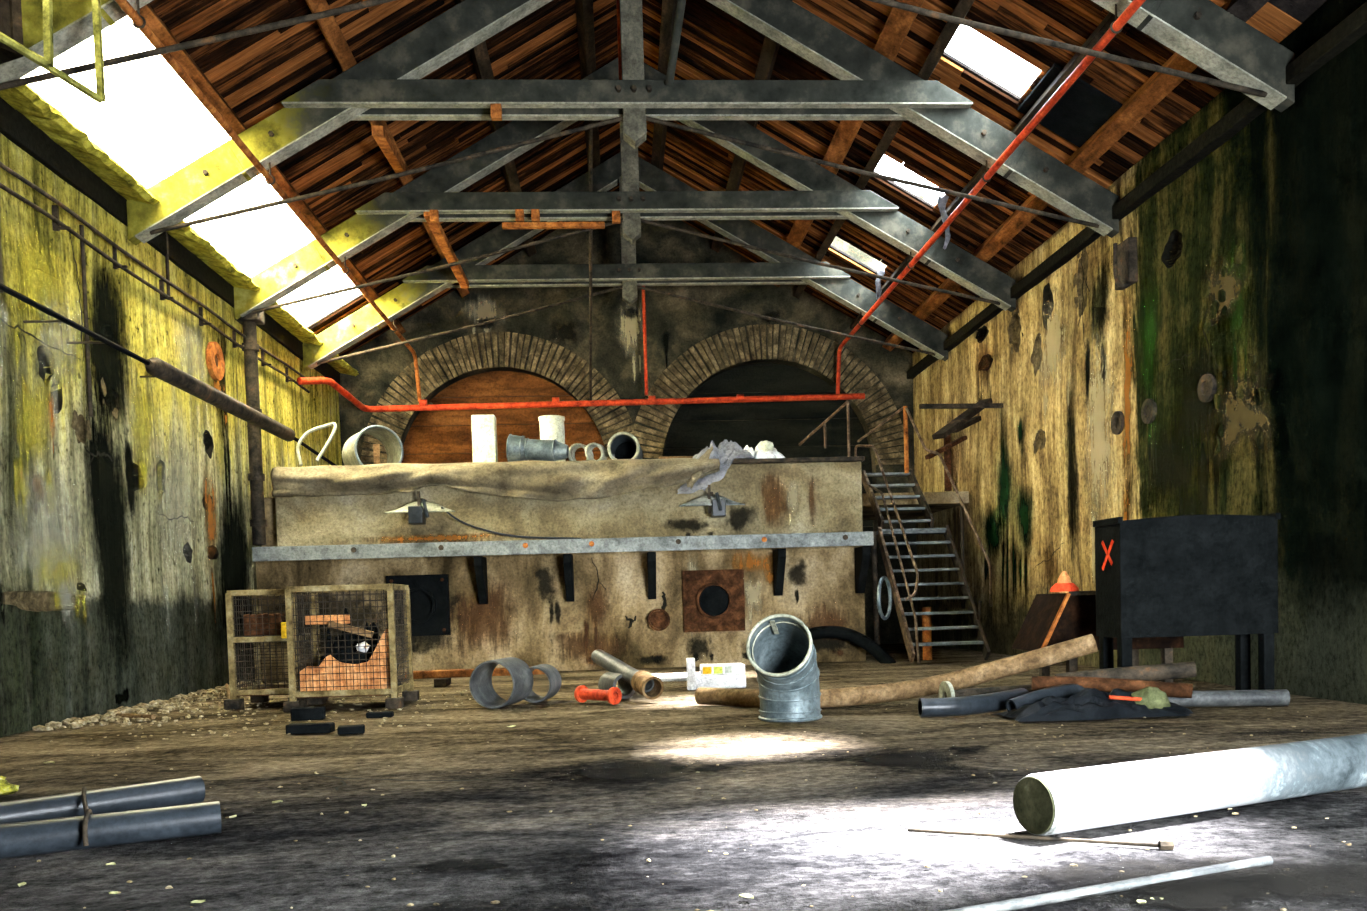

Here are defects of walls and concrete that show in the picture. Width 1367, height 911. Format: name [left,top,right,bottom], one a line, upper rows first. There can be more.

spalling [1201,244,1247,333]
spalling [1214,353,1272,459]
water stain [45,262,162,660]
corrosion [762,475,787,525]
water stain [115,688,129,705]